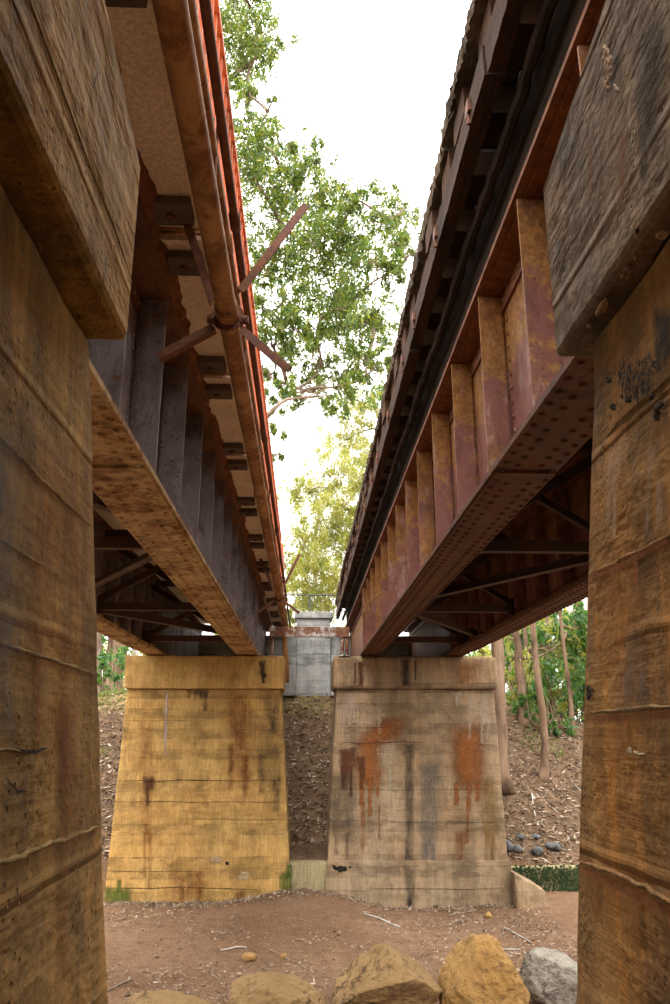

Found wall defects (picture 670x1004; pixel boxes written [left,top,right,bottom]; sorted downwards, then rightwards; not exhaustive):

corrosion [144,778,154,805]
corrosion [340,719,400,838]
corrosion [454,728,496,860]